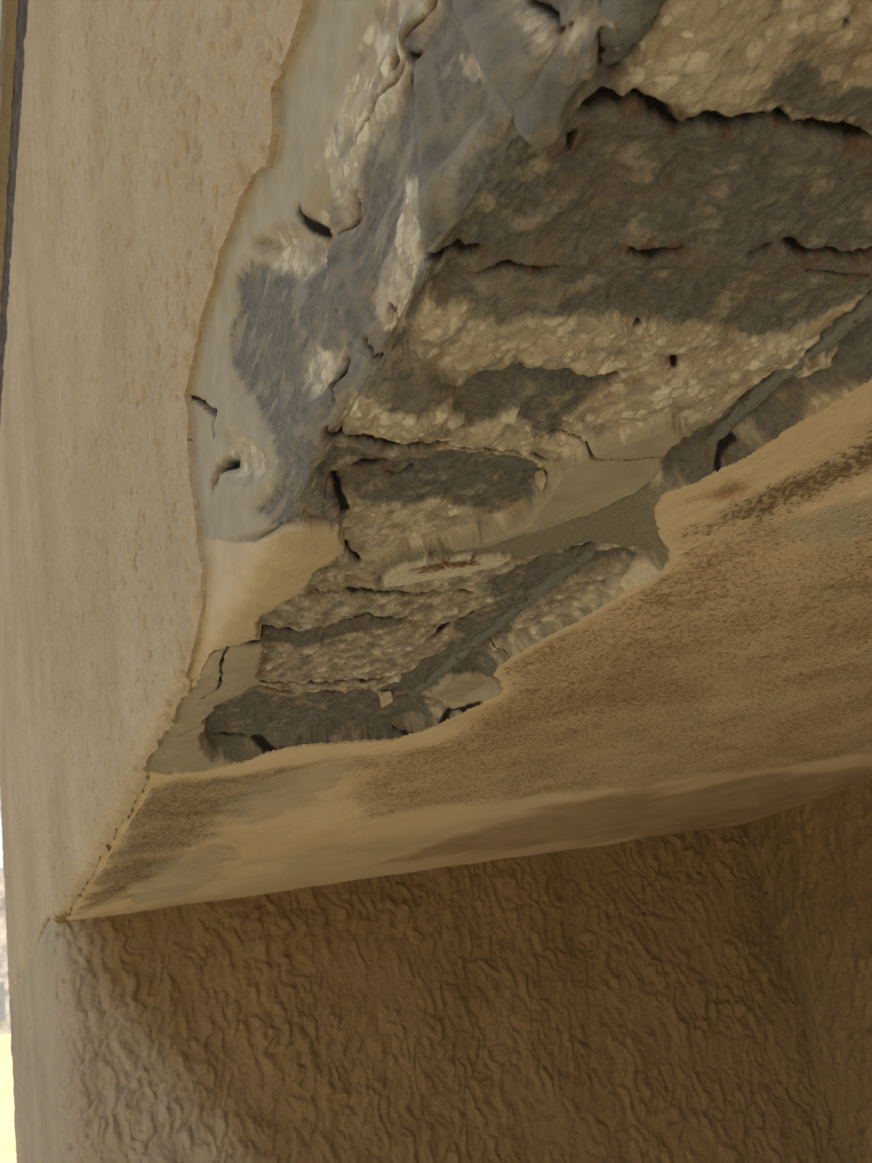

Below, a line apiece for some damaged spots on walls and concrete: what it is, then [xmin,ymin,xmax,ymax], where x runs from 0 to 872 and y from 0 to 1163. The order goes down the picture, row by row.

spalling [145,0,872,774]
crack [178,646,230,736]
corrosion [410,550,481,576]
damp [346,431,872,818]
damp [81,766,303,910]